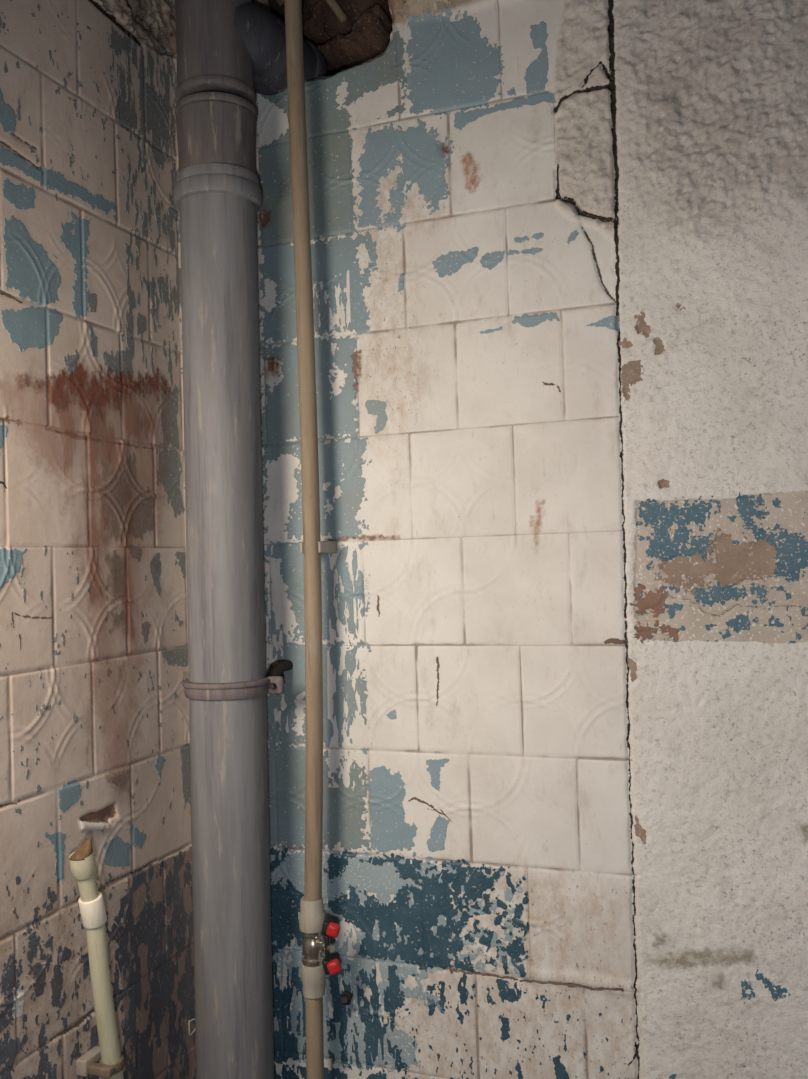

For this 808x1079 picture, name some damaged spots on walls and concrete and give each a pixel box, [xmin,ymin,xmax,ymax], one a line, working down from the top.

peeling [0,4,188,700]
corrosion [21,363,170,603]
peeling [257,89,307,1079]
peeling [302,0,583,1079]
spalling [586,311,665,355]
spalling [620,360,645,402]
crack [553,0,797,1079]
peeling [630,479,808,644]
peeling [0,779,196,1079]
peeling [117,700,191,826]
crack [408,797,452,822]
peeling [741,969,791,1001]